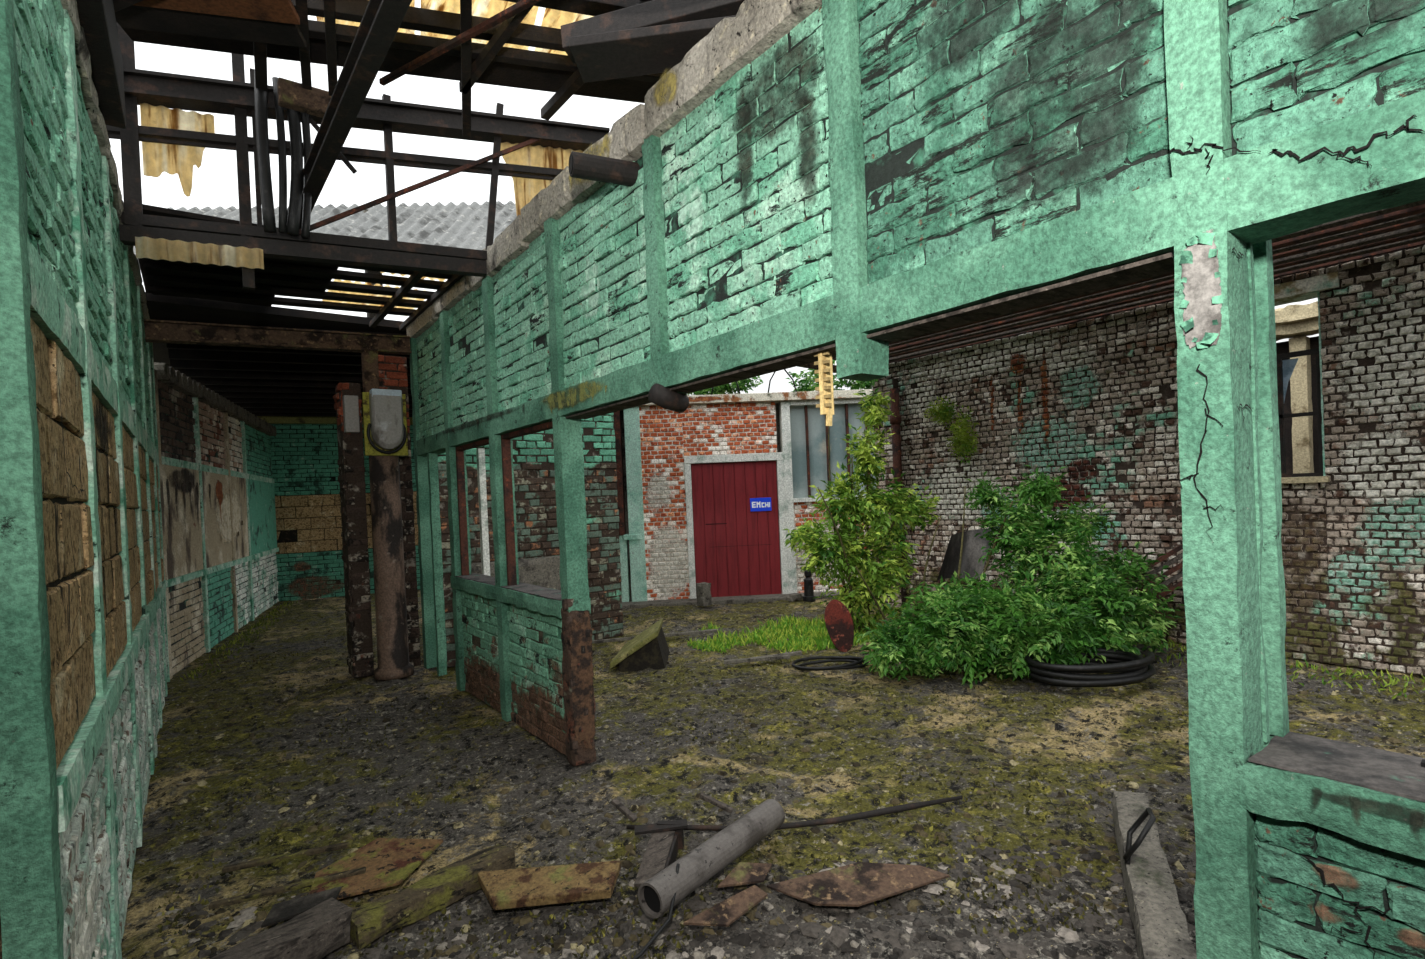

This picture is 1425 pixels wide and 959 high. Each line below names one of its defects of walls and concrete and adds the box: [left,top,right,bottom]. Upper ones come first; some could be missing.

leakage [733,39,818,200]
crack [1169,115,1425,174]
peeling [1179,229,1223,349]
corrosion [1010,353,1050,448]
peeling [1011,346,1102,524]
crack [1179,364,1254,543]